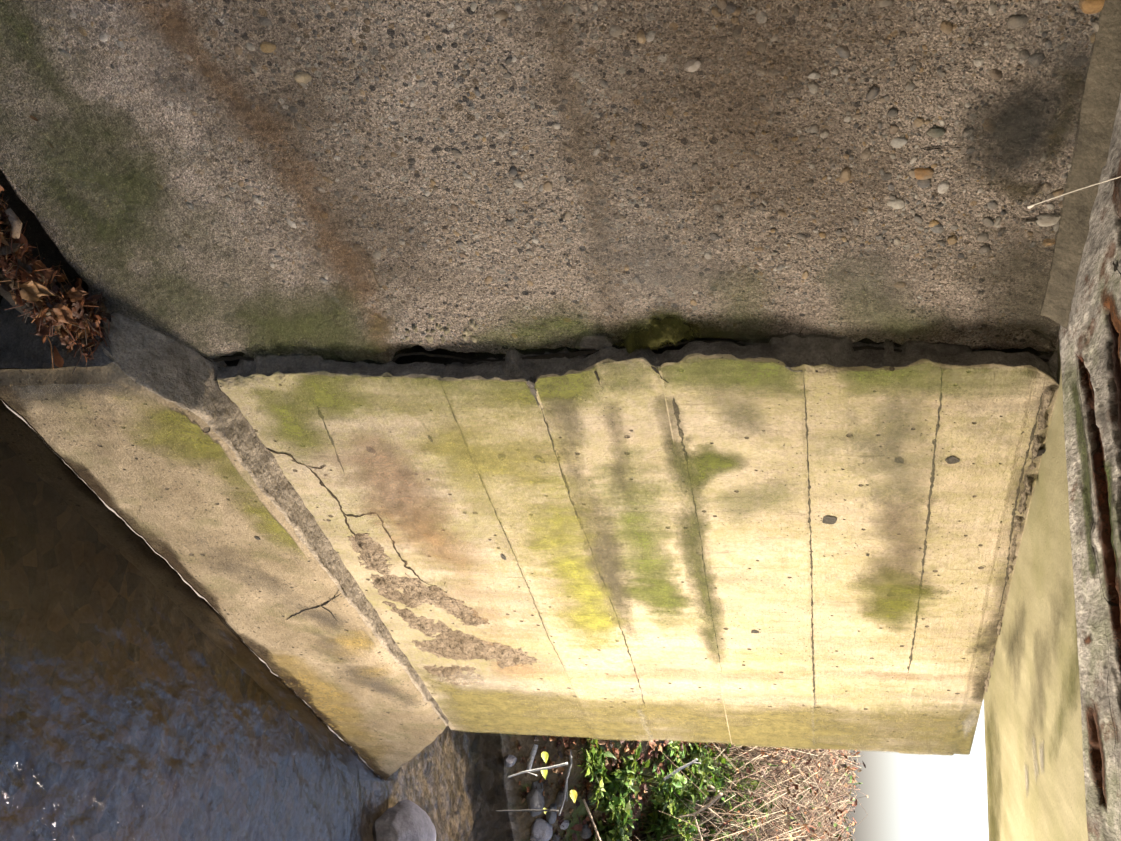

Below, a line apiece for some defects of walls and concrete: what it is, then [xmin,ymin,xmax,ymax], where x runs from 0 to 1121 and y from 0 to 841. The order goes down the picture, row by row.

damp [969,74,1070,173]
crack [199,345,622,407]
rust [1102,295,1121,360]
crack [287,593,341,621]
crack [266,448,433,586]
damp [592,480,684,614]
crack [649,328,1121,831]
rust [1076,355,1121,669]
rust [1086,707,1107,805]